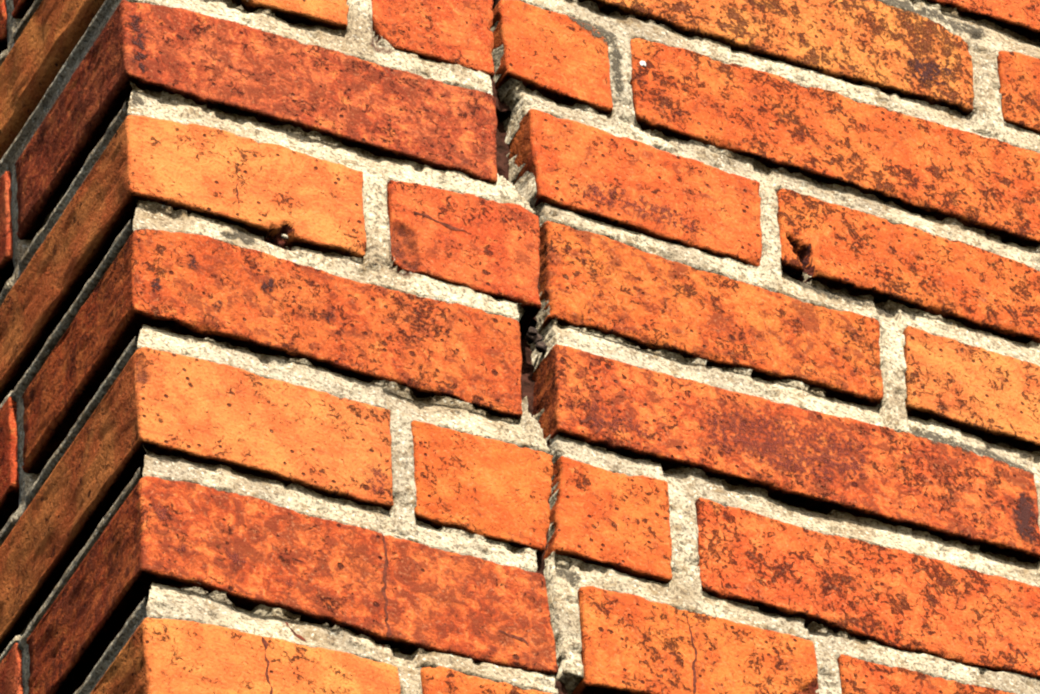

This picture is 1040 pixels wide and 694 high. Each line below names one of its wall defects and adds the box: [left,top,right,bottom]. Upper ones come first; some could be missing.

crack [491,63,513,186]
crack [520,281,548,417]
crack [536,531,549,576]
crack [554,681,568,694]
spalling [793,678,819,694]